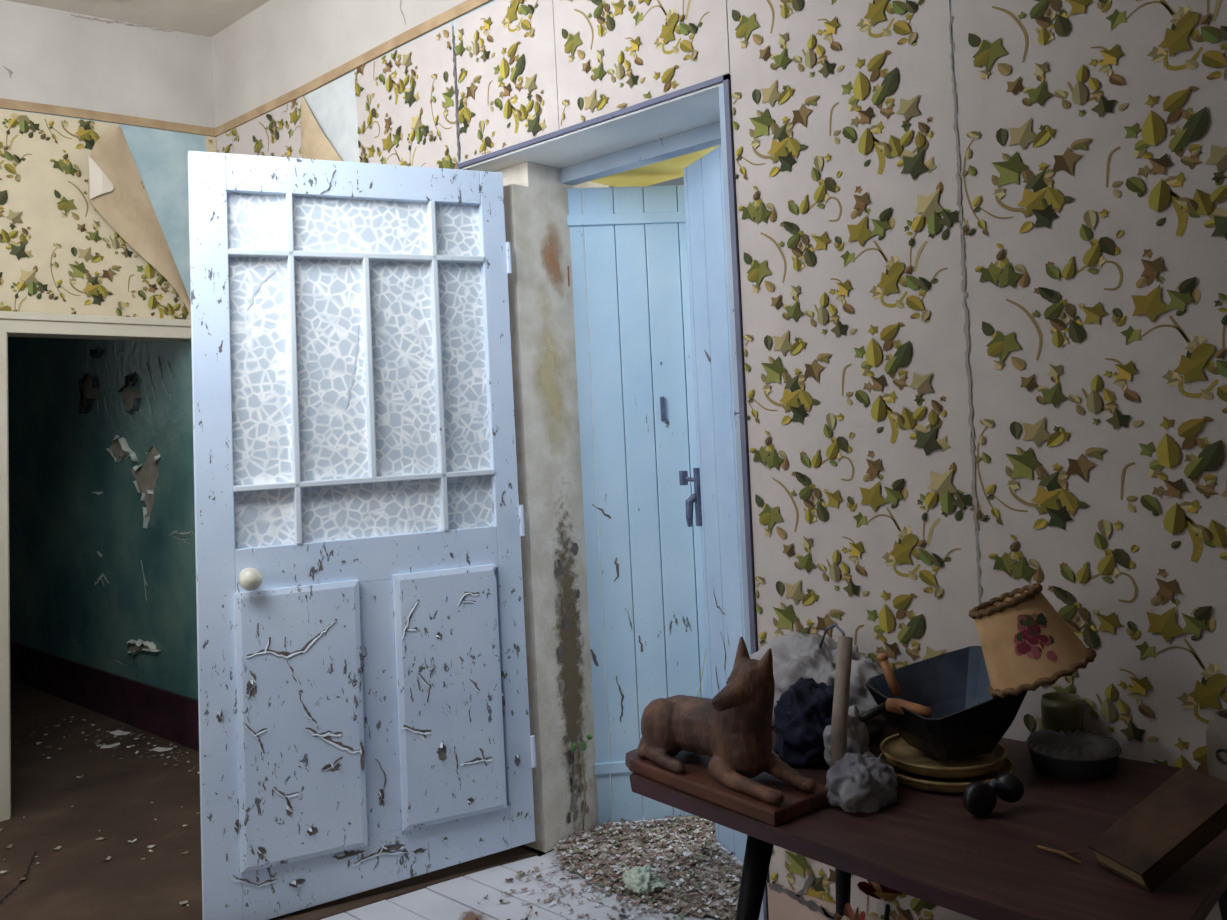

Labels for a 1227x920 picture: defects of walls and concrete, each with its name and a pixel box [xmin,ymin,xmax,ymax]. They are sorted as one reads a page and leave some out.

peeling [304,72,360,163]
peeling [118,372,141,415]
peeling [106,435,161,529]
peeling [125,639,161,656]
crack [0,852,37,905]